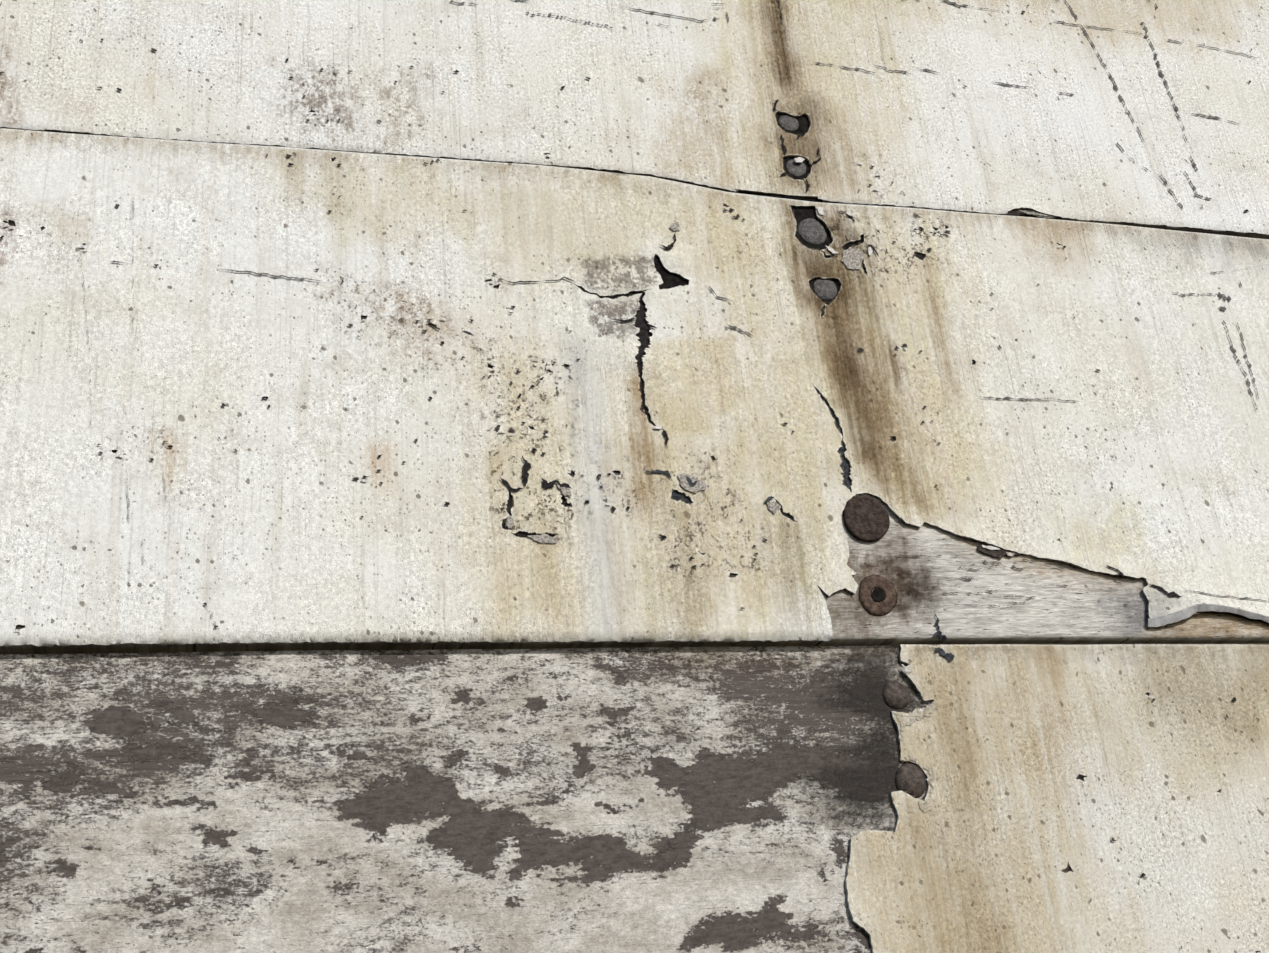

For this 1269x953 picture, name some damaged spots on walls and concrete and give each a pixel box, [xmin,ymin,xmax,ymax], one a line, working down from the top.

crack [507,222,706,505]
crack [816,390,852,492]
rust [859,559,926,610]
peeling [1147,604,1269,627]
peeling [523,676,572,721]
peeling [83,697,292,789]
peeling [39,761,269,857]
peeling [311,703,937,908]
peeling [44,839,101,879]
peeling [130,879,192,915]
peeling [676,893,833,953]
peeling [852,922,871,953]